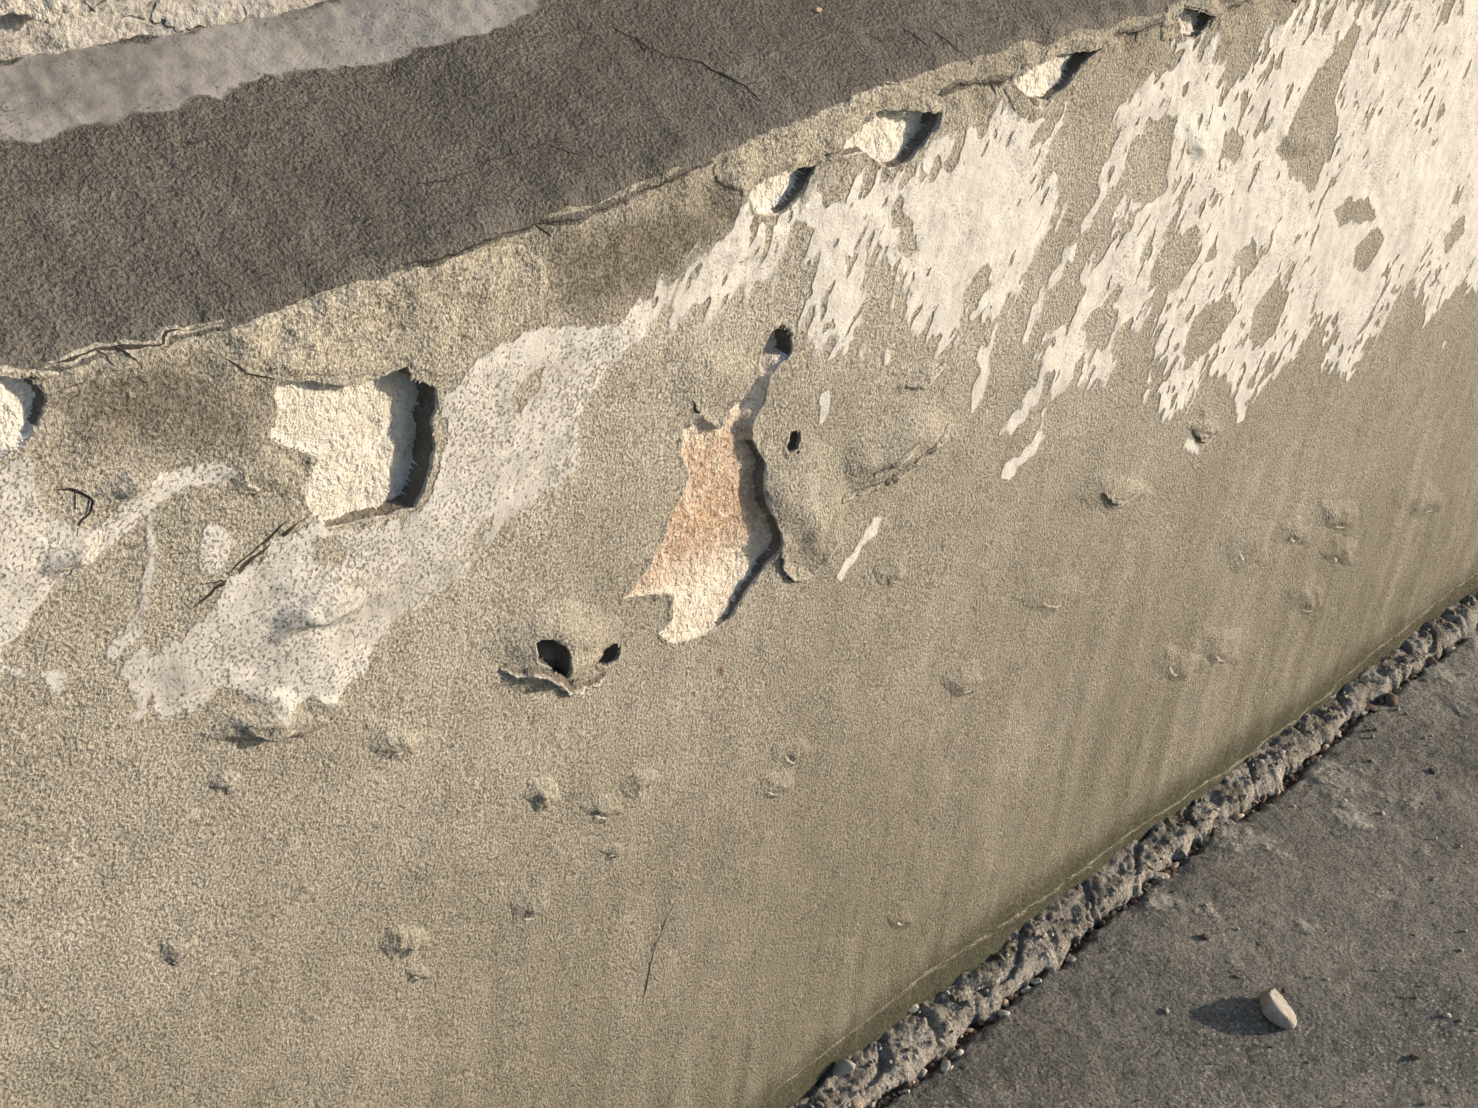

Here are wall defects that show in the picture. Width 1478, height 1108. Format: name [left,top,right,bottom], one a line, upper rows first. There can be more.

crack [1226,0,1302,12]
crack [1114,13,1167,42]
crack [611,26,764,104]
crack [182,134,213,149]
crack [418,133,578,187]
crack [787,145,845,173]
crack [396,159,713,268]
crack [43,319,277,395]
peeling [0,0,1478,729]
damp [95,389,230,429]
crack [692,398,703,414]